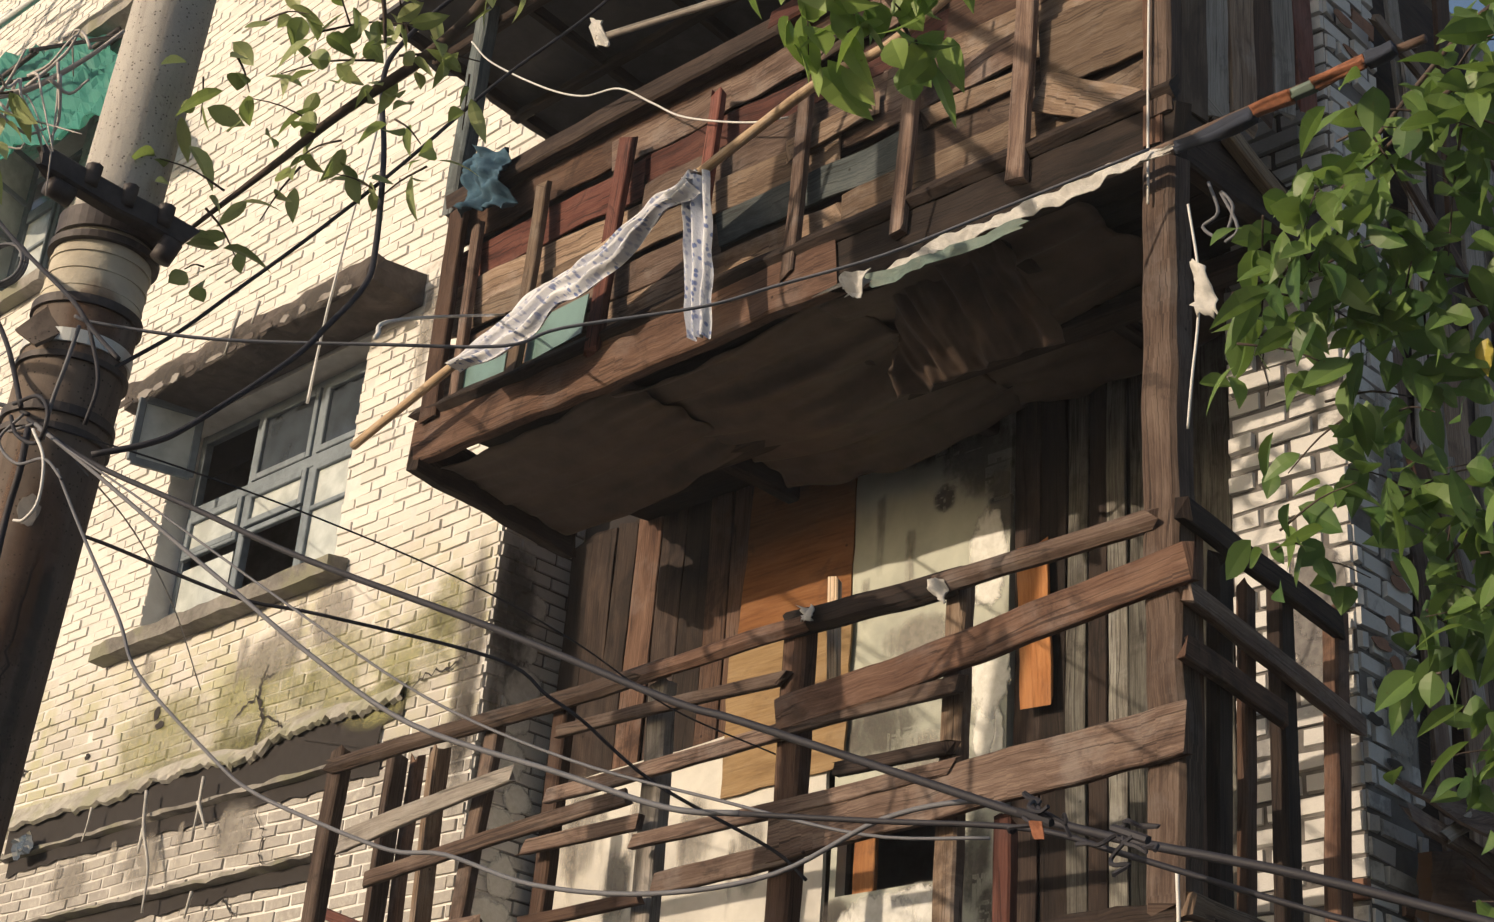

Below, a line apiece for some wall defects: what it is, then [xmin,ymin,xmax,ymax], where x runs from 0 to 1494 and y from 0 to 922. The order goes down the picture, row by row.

mould [914,419,1016,534]
water stain [237,590,348,680]
water stain [891,617,945,654]
crack [234,665,283,759]
water stain [846,708,939,770]